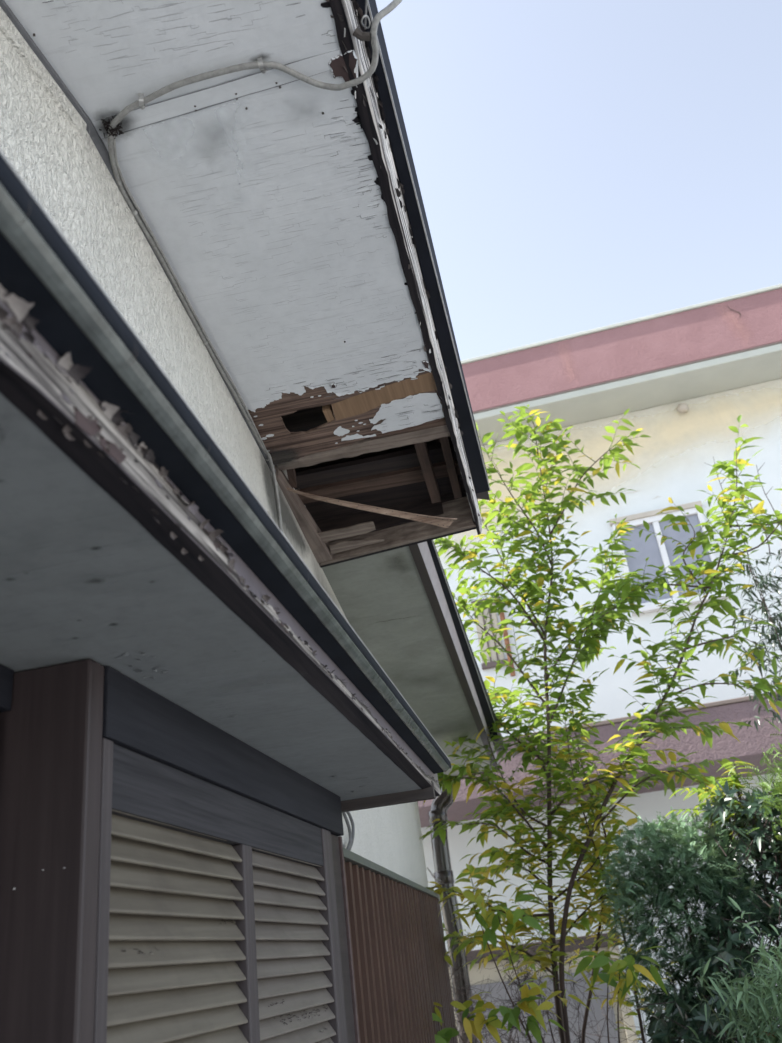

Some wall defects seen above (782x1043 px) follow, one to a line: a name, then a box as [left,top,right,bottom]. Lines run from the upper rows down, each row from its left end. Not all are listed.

peeling [321,0,392,200]
peeling [395,179,416,248]
peeling [0,284,464,795]